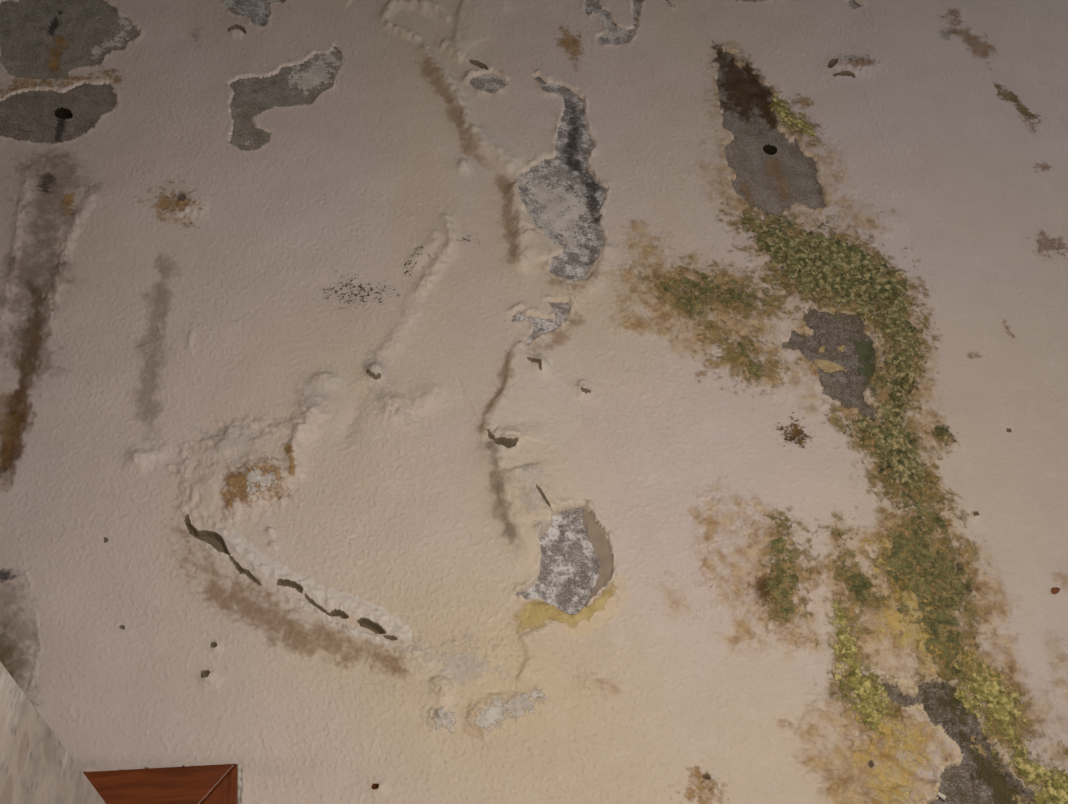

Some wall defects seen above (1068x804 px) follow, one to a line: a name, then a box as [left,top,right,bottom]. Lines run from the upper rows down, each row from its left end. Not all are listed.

peeling [214,0,290,30]
peeling [581,0,649,48]
peeling [0,0,143,145]
peeling [224,40,346,153]
water stain [1036,230,1066,257]
water stain [0,286,44,472]
peeling [506,33,1068,804]
water stain [777,412,812,451]
crack [184,514,413,652]
water stain [756,577,778,601]
water stain [687,767,715,804]